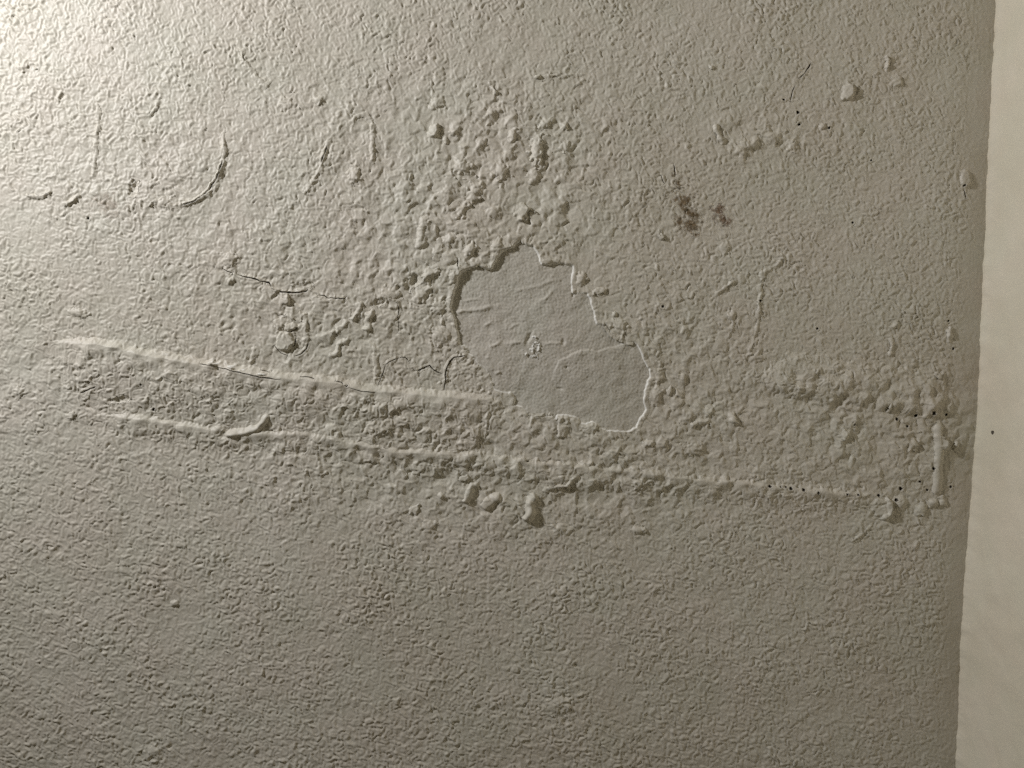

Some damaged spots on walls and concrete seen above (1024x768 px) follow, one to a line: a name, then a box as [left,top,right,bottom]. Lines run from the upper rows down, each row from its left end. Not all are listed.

crack [198,266,348,383]